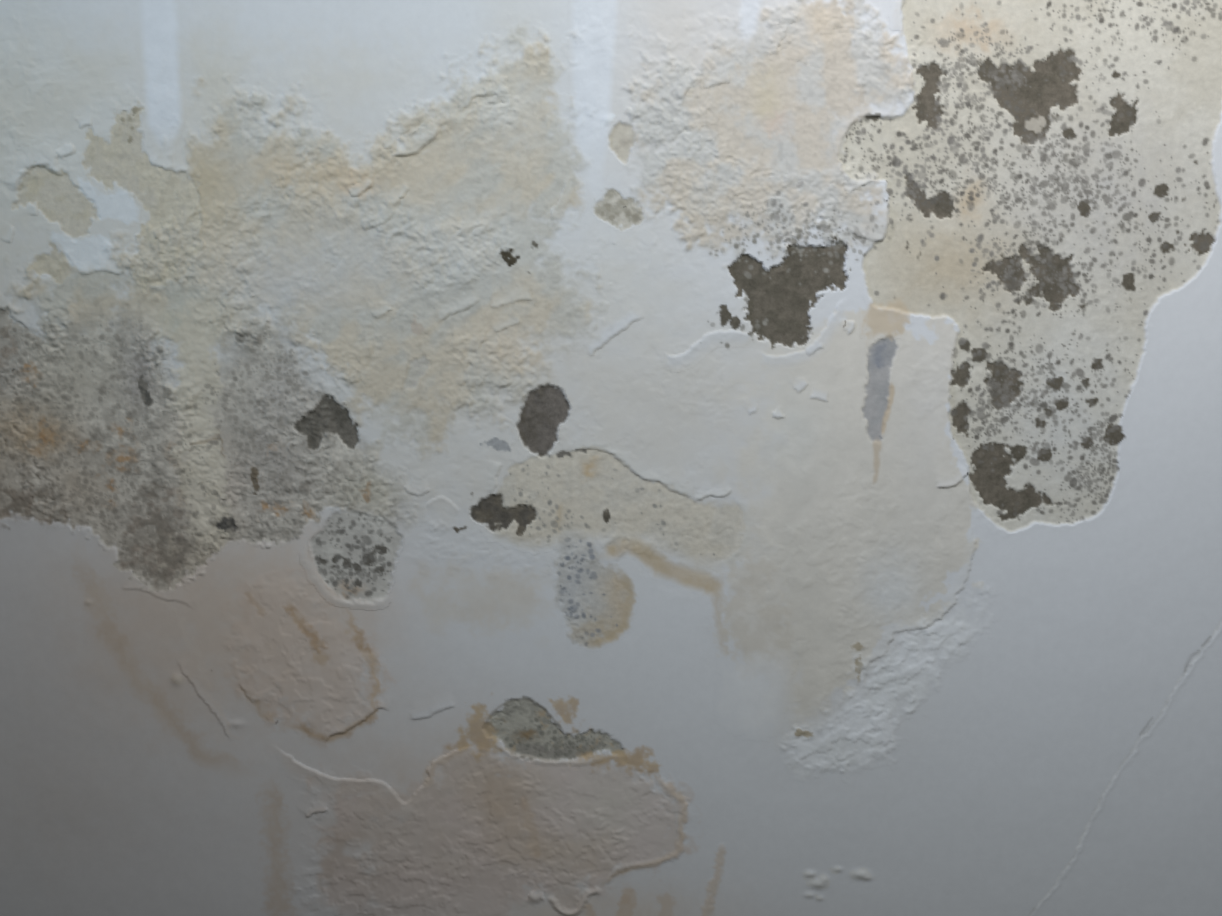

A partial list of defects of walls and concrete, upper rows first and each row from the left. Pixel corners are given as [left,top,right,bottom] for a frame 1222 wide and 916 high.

flaking render [0,97,760,651]
flaking render [705,0,1222,534]
leakage [208,541,730,916]
flaking render [443,691,665,787]